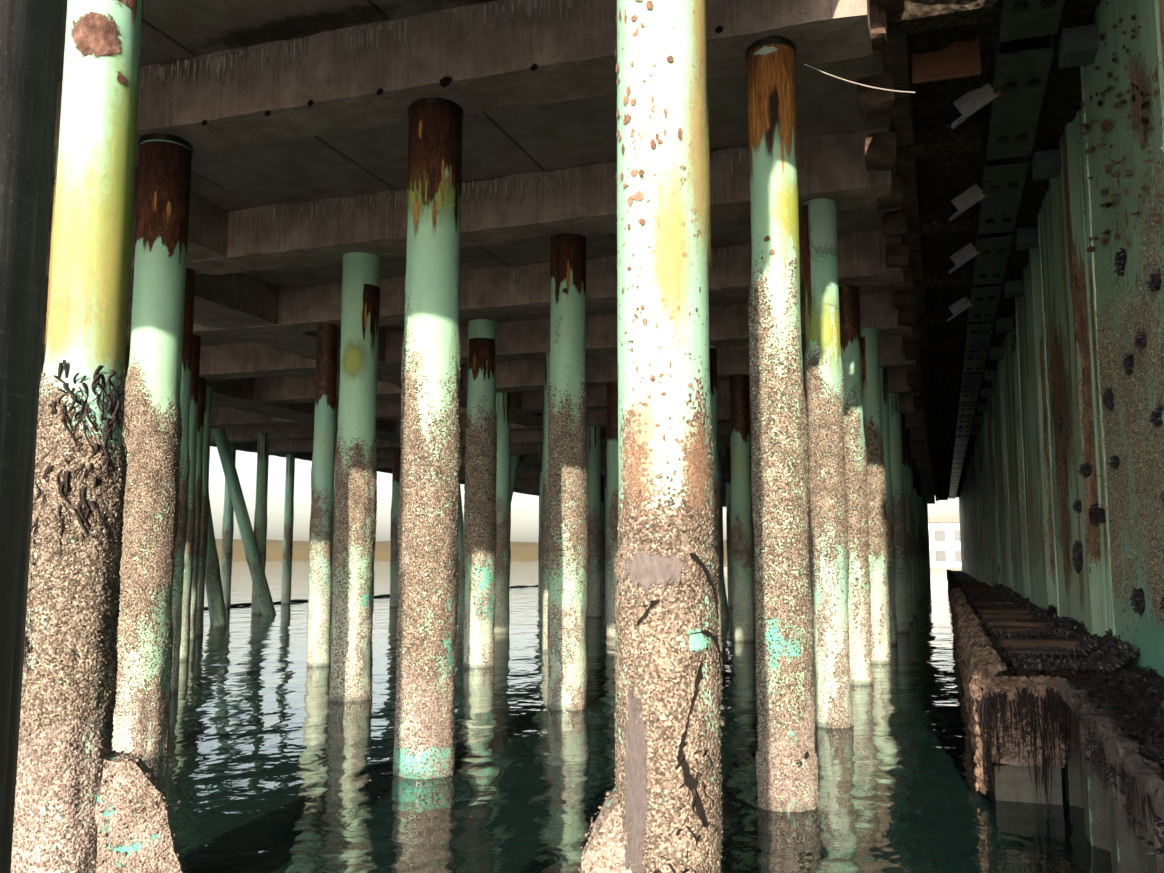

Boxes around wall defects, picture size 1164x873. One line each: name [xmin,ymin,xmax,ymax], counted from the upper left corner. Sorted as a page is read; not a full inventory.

corrosion [71,0,144,58]
corrosion [747,44,798,177]
peeling [1078,15,1164,225]
corrosion [135,141,192,260]
corrosion [408,104,462,232]
corrosion [550,233,586,303]
peeling [1085,229,1130,253]
corrosion [362,284,380,348]
corrosion [709,348,717,394]
peeling [623,549,695,592]
crack [636,599,661,626]
crack [676,552,722,828]